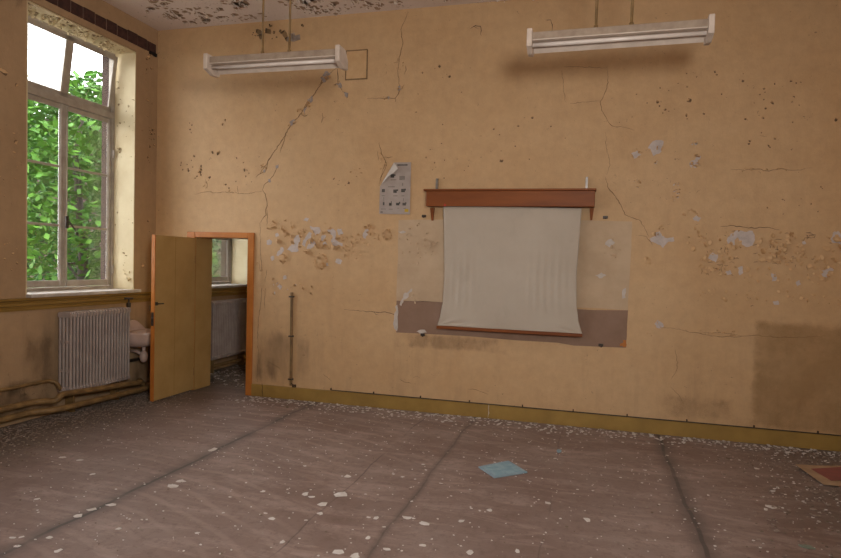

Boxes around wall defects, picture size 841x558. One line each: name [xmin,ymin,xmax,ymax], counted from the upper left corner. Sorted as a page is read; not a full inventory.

peeling [146,0,288,42]
peeling [277,0,403,16]
crack [198,13,408,396]
peeling [267,218,393,270]
peeling [682,209,841,305]